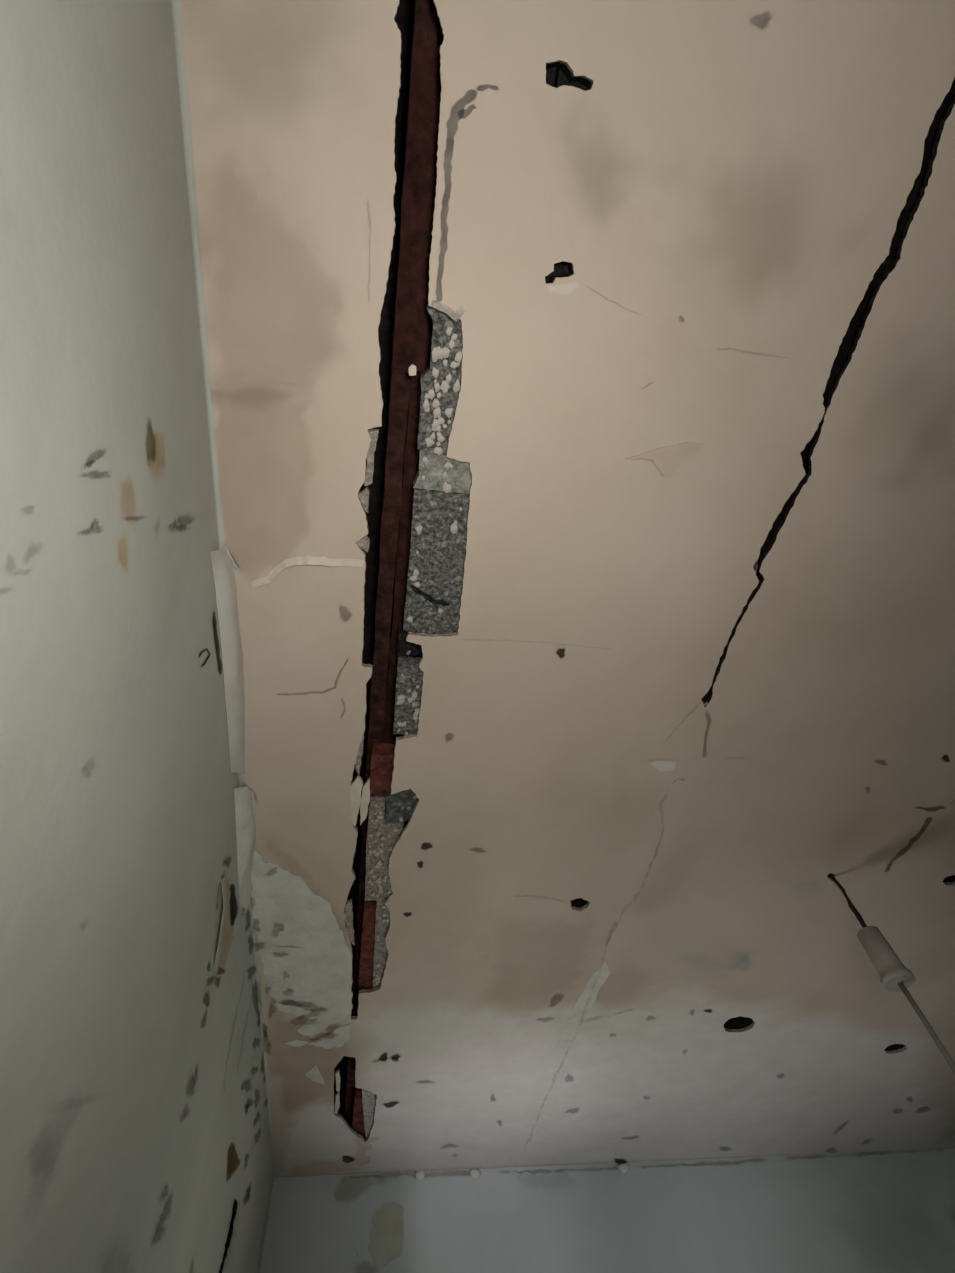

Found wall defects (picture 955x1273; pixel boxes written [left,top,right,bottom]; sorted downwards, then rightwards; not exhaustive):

crack [702,78,955,702]
spalling [393,300,472,736]
peeling [212,851,353,1049]
spalling [365,788,418,988]
spalling [362,1089,377,1138]
peeling [368,1202,404,1269]